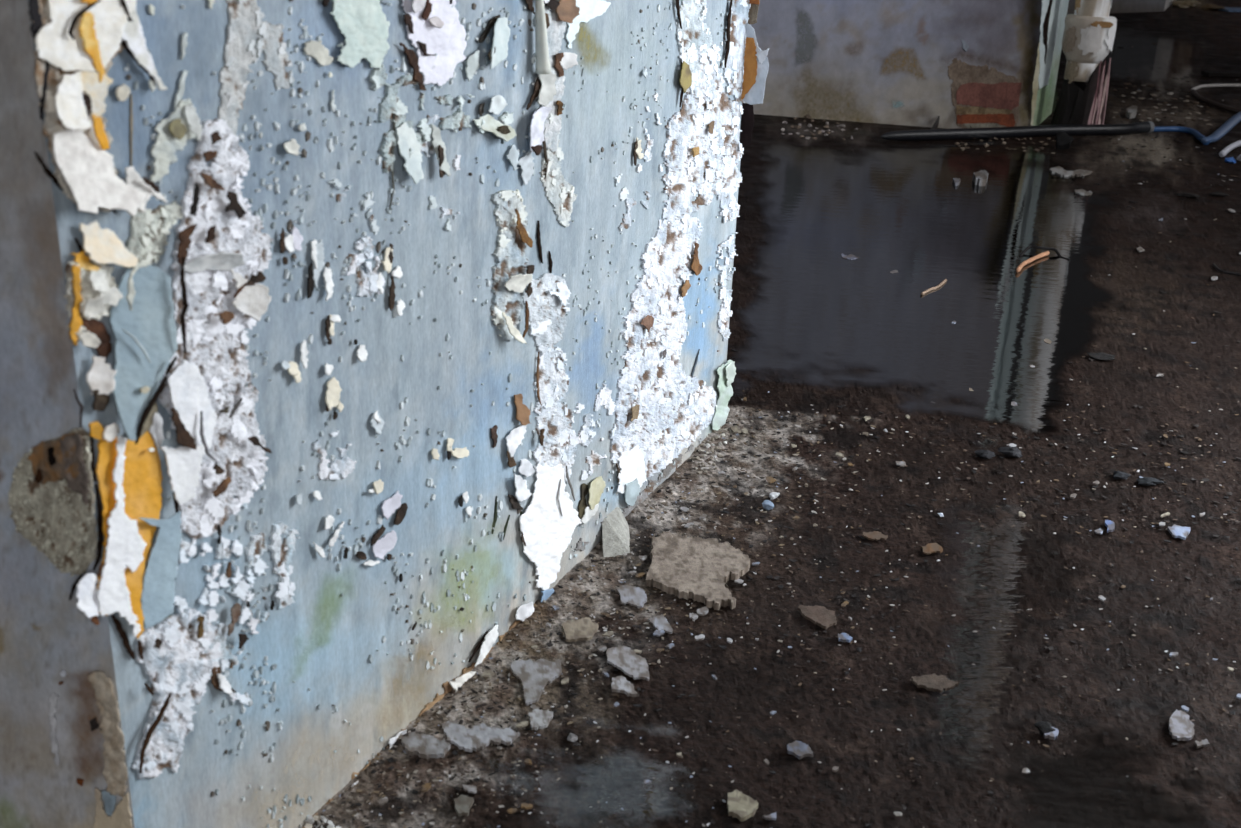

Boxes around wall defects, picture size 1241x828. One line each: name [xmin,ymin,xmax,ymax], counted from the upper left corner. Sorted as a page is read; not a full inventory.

flaking render [948,40,1023,128]
peeling [1038,0,1117,89]
peeling [8,0,770,828]